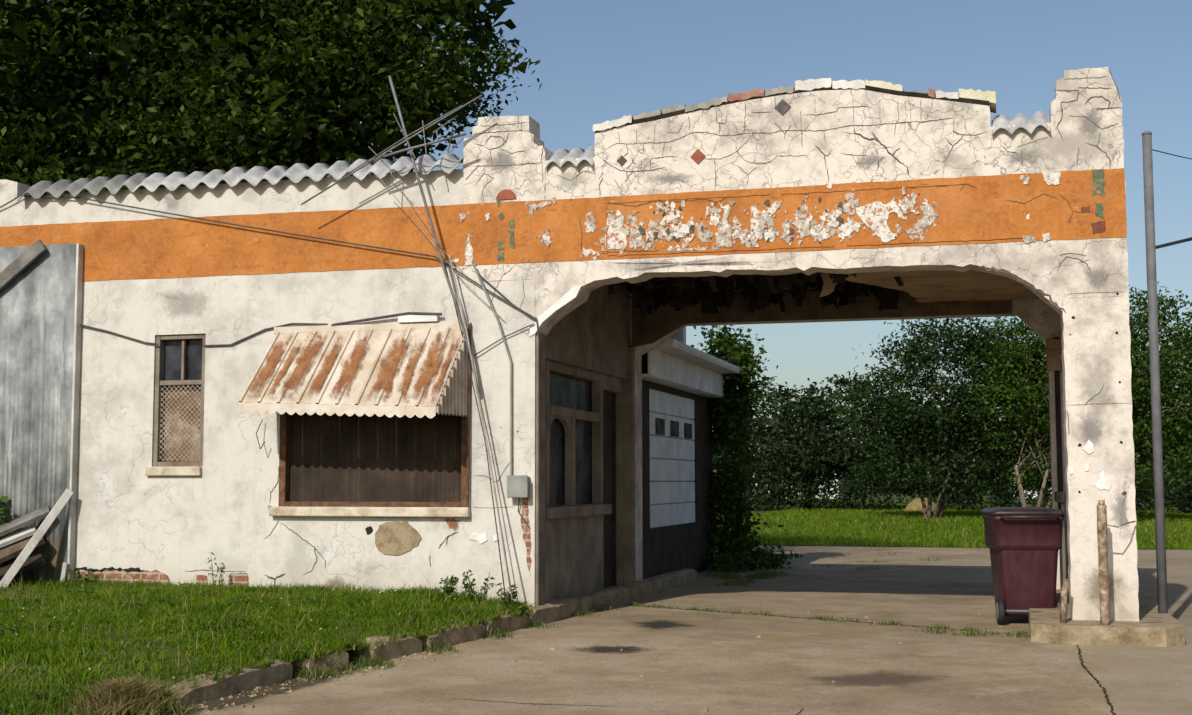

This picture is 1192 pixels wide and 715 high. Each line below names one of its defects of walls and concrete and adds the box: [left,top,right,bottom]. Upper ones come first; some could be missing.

crack [474,69,1121,207]
peeling [446,210,477,266]
peeling [485,200,515,262]
peeling [537,228,552,249]
peeling [580,183,938,261]
corrosion [247,333,371,398]
peeling [1070,440,1111,490]
crack [179,467,326,585]
spalling [375,521,422,555]
spalling [520,498,532,575]
spalling [74,570,169,585]
crack [1077,645,1116,715]